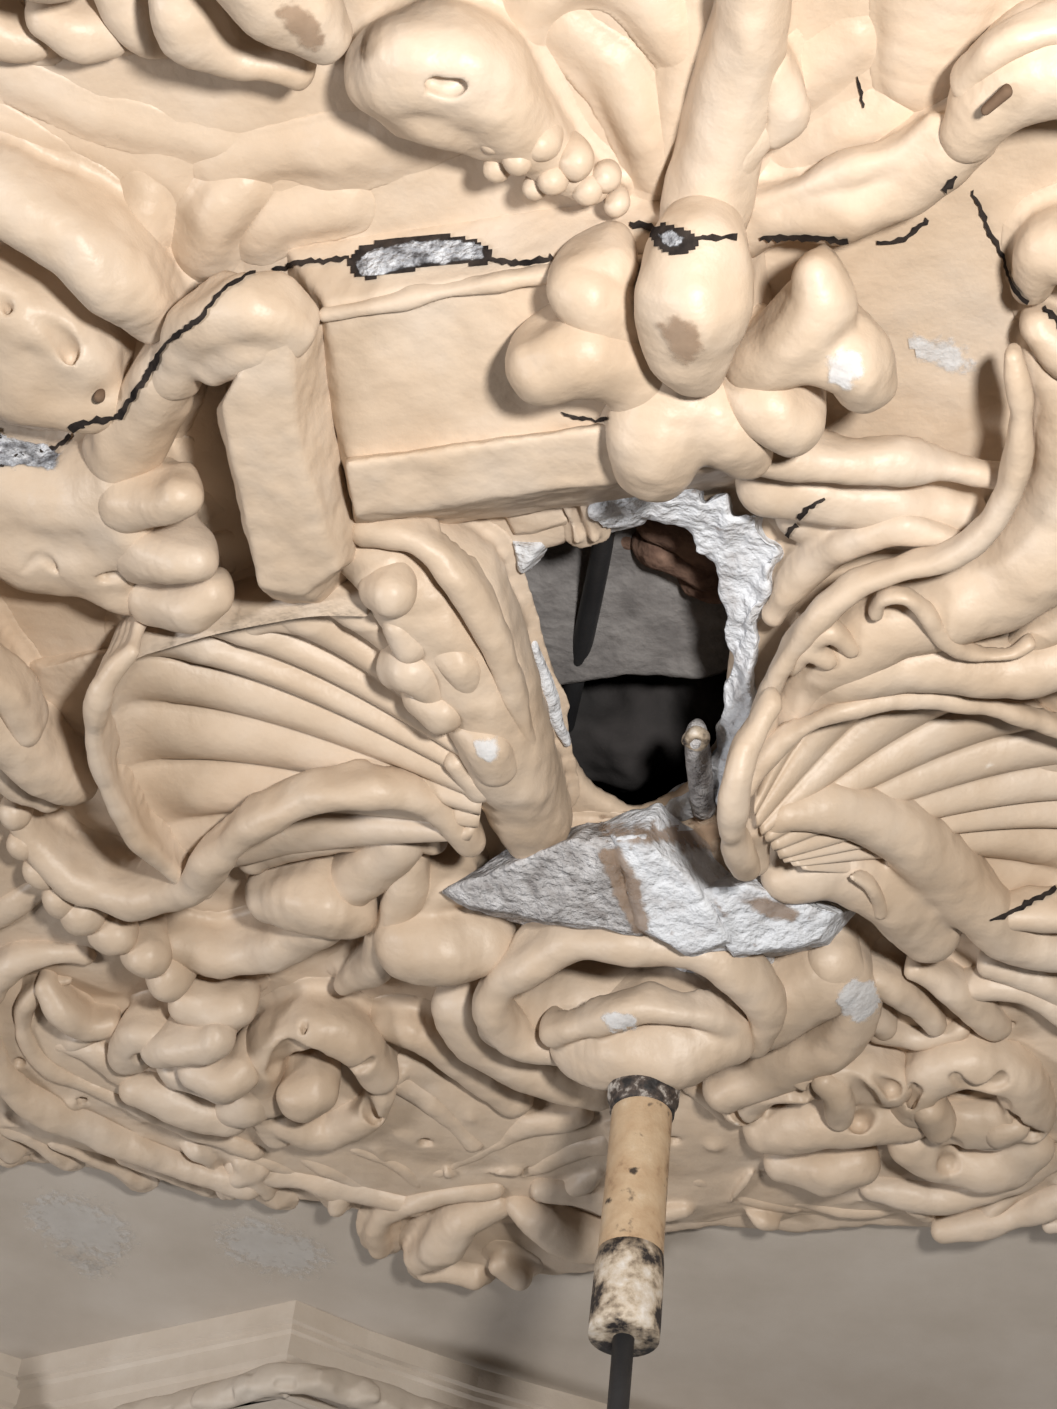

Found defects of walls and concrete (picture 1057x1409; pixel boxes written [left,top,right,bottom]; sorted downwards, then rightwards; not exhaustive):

flaking render [347,233,492,280]
crack [488,254,554,266]
crack [629,220,654,231]
crack [693,175,1057,322]
crack [14,255,349,457]
crack [561,412,607,423]
flaking render [0,434,60,470]
flaking render [513,541,547,574]
flaking render [588,489,784,806]
flaking render [532,641,571,747]
flaking render [442,782,856,973]
crack [990,885,1057,921]